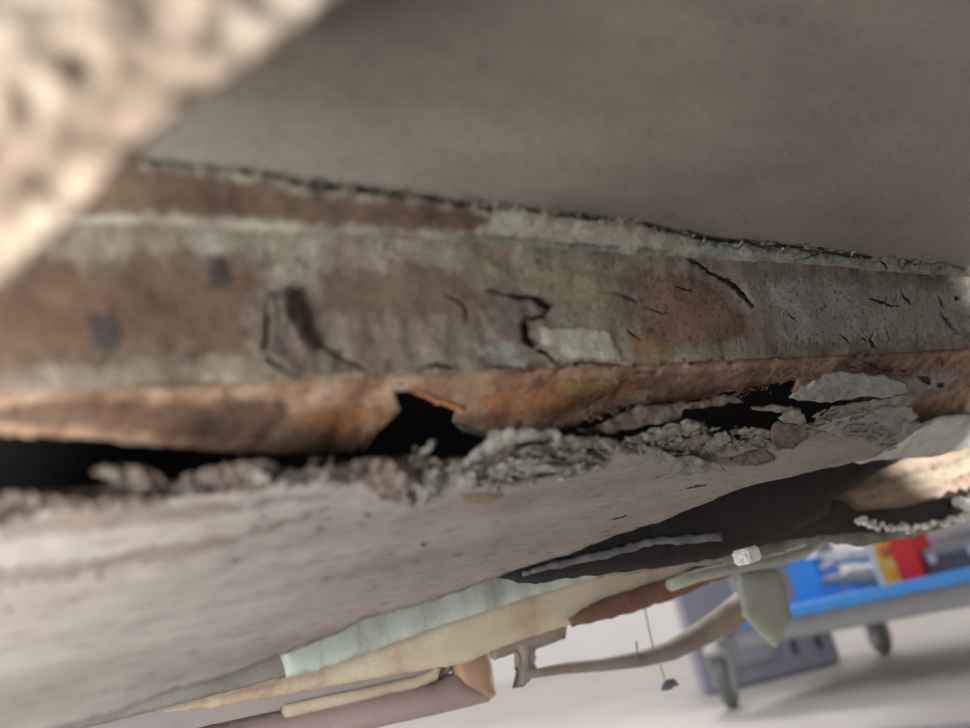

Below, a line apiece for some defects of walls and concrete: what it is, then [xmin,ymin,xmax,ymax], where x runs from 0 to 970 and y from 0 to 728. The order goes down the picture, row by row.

spalling [0,370,924,528]